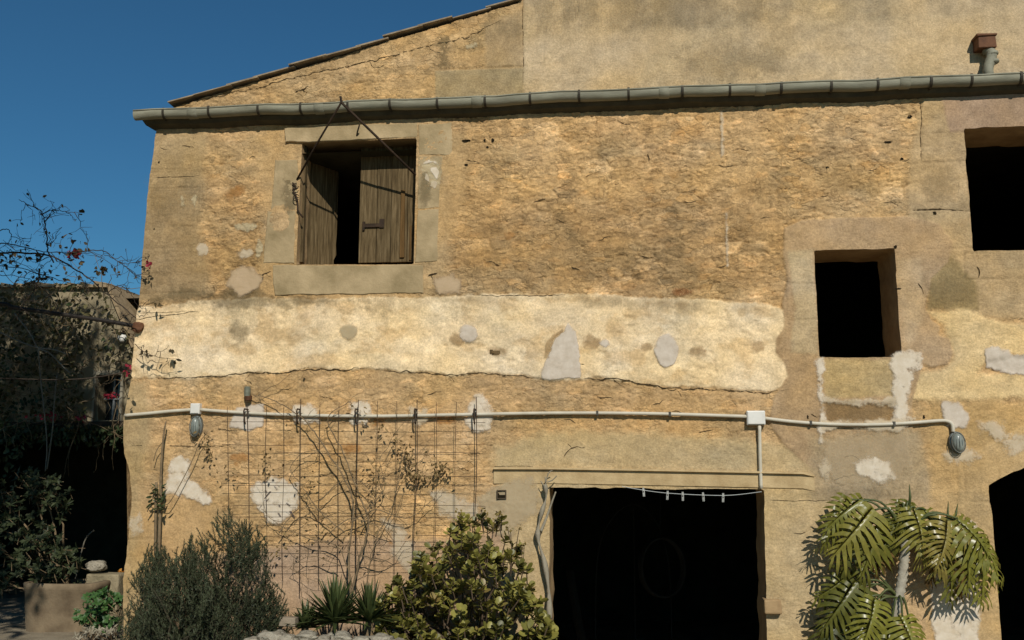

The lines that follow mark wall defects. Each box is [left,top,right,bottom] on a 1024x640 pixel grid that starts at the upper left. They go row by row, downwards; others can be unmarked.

crack [197,9,524,102]
flaking render [420,159,442,188]
crack [163,367,539,395]